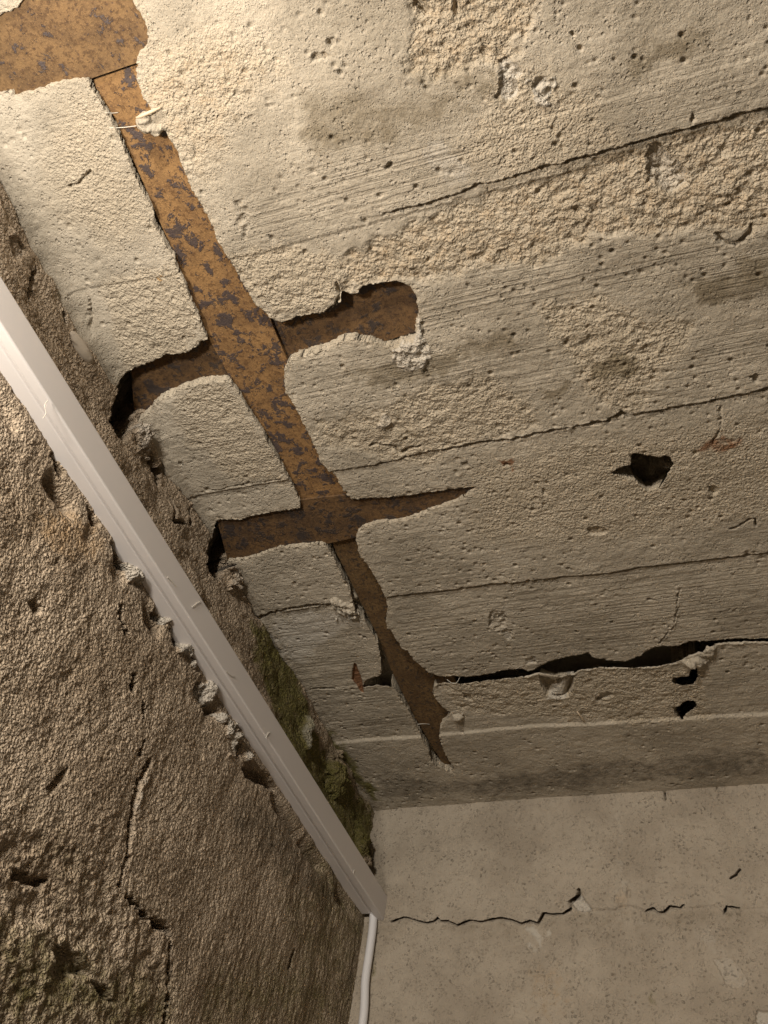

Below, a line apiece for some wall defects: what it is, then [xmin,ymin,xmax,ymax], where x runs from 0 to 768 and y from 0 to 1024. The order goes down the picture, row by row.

crack [381,106,768,217]
spalling [0,0,478,773]
crack [329,386,768,472]
damp [256,605,369,675]
rust [351,662,386,694]
crack [385,517,768,704]
crack [390,887,741,928]